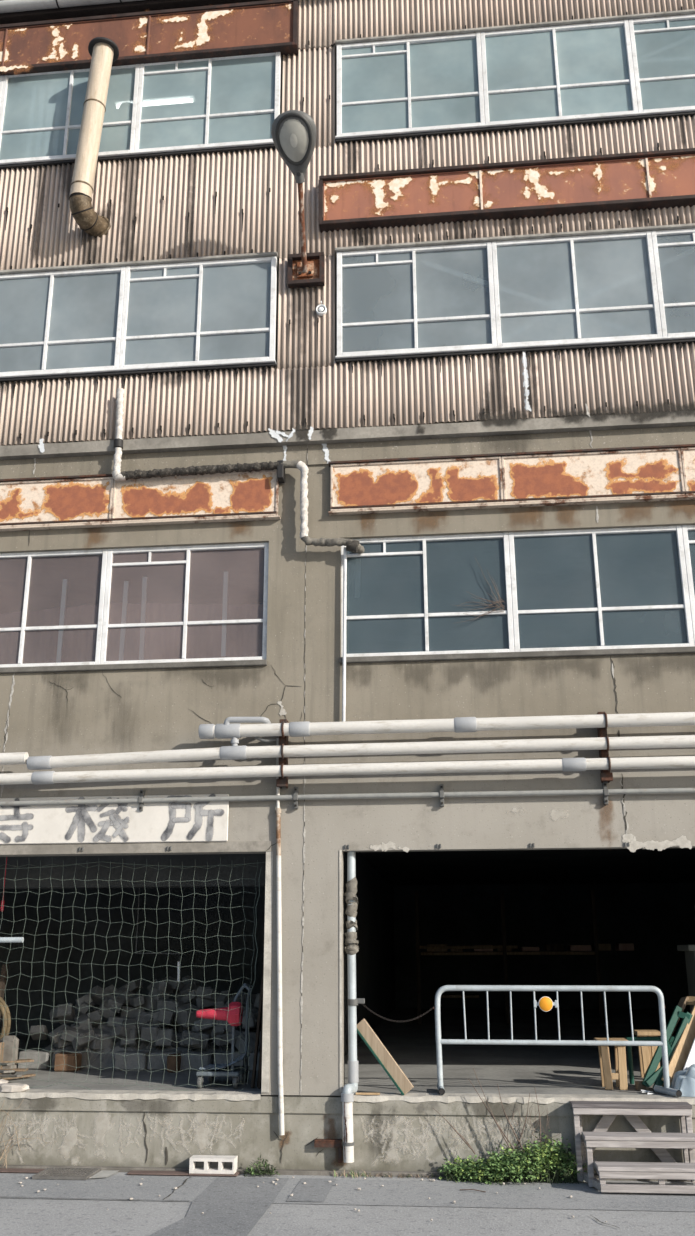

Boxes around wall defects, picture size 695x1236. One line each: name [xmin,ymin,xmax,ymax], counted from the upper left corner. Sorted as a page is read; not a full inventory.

corrosion [0,475,273,522]
corrosion [335,459,589,506]
corrosion [603,459,695,494]
crack [262,545,307,1095]
spalling [622,833,692,852]
crack [143,1111,168,1165]